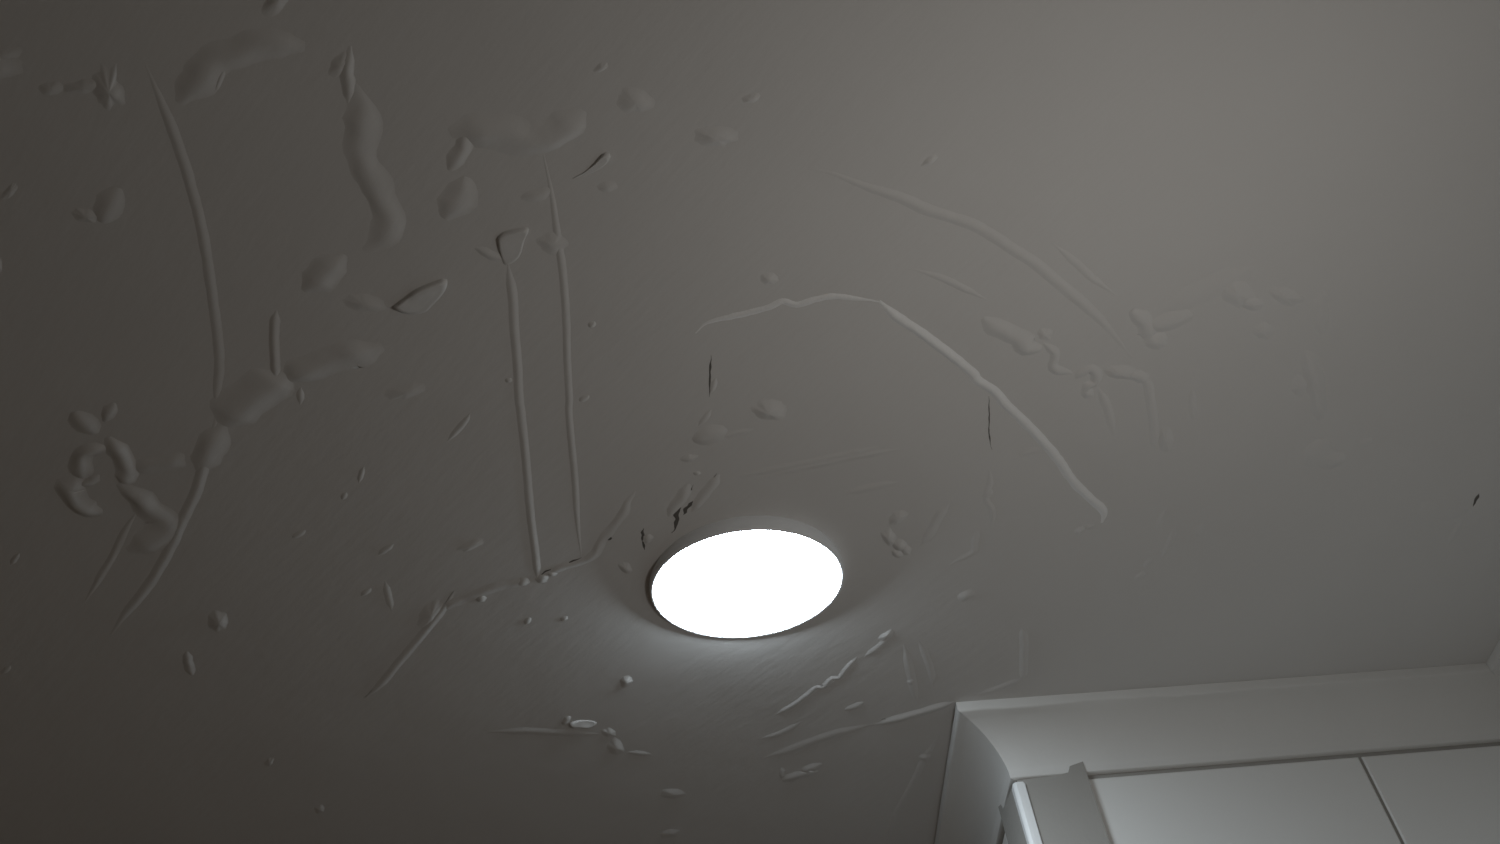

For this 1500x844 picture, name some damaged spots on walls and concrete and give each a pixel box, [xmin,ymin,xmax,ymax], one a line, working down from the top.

crack [365,471,720,699]